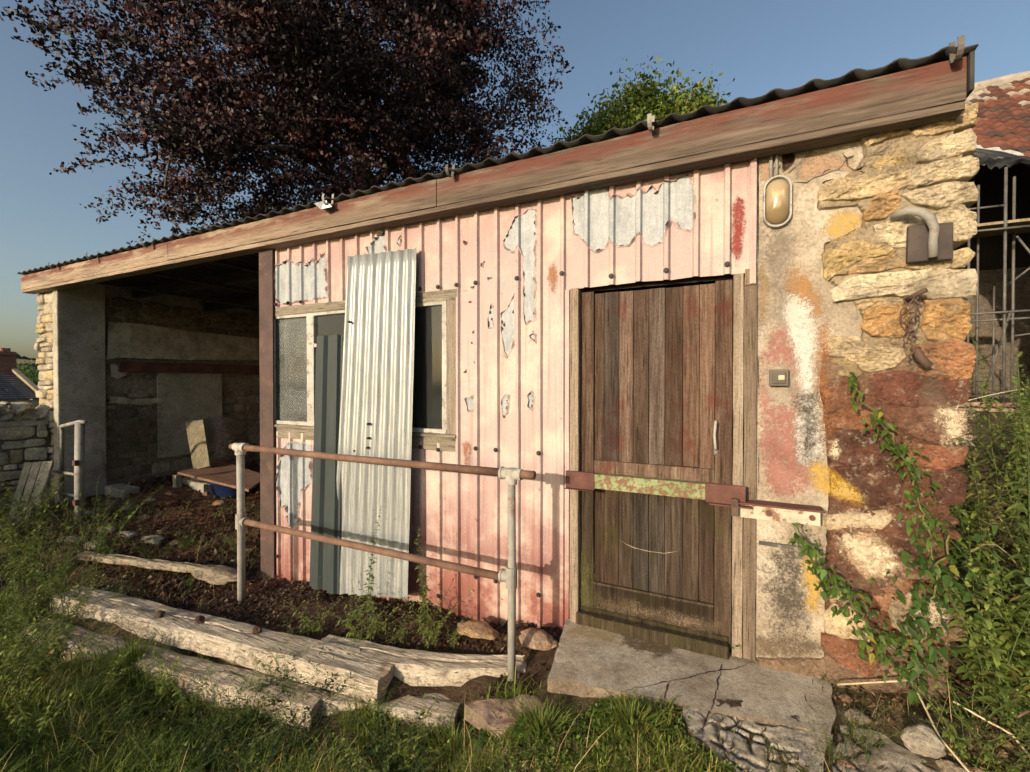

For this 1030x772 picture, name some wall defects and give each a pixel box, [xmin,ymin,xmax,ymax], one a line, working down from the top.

peeling [569,173,696,253]
peeling [274,252,328,305]
peeling [487,208,537,358]
peeling [275,441,313,528]
crack [620,660,796,772]